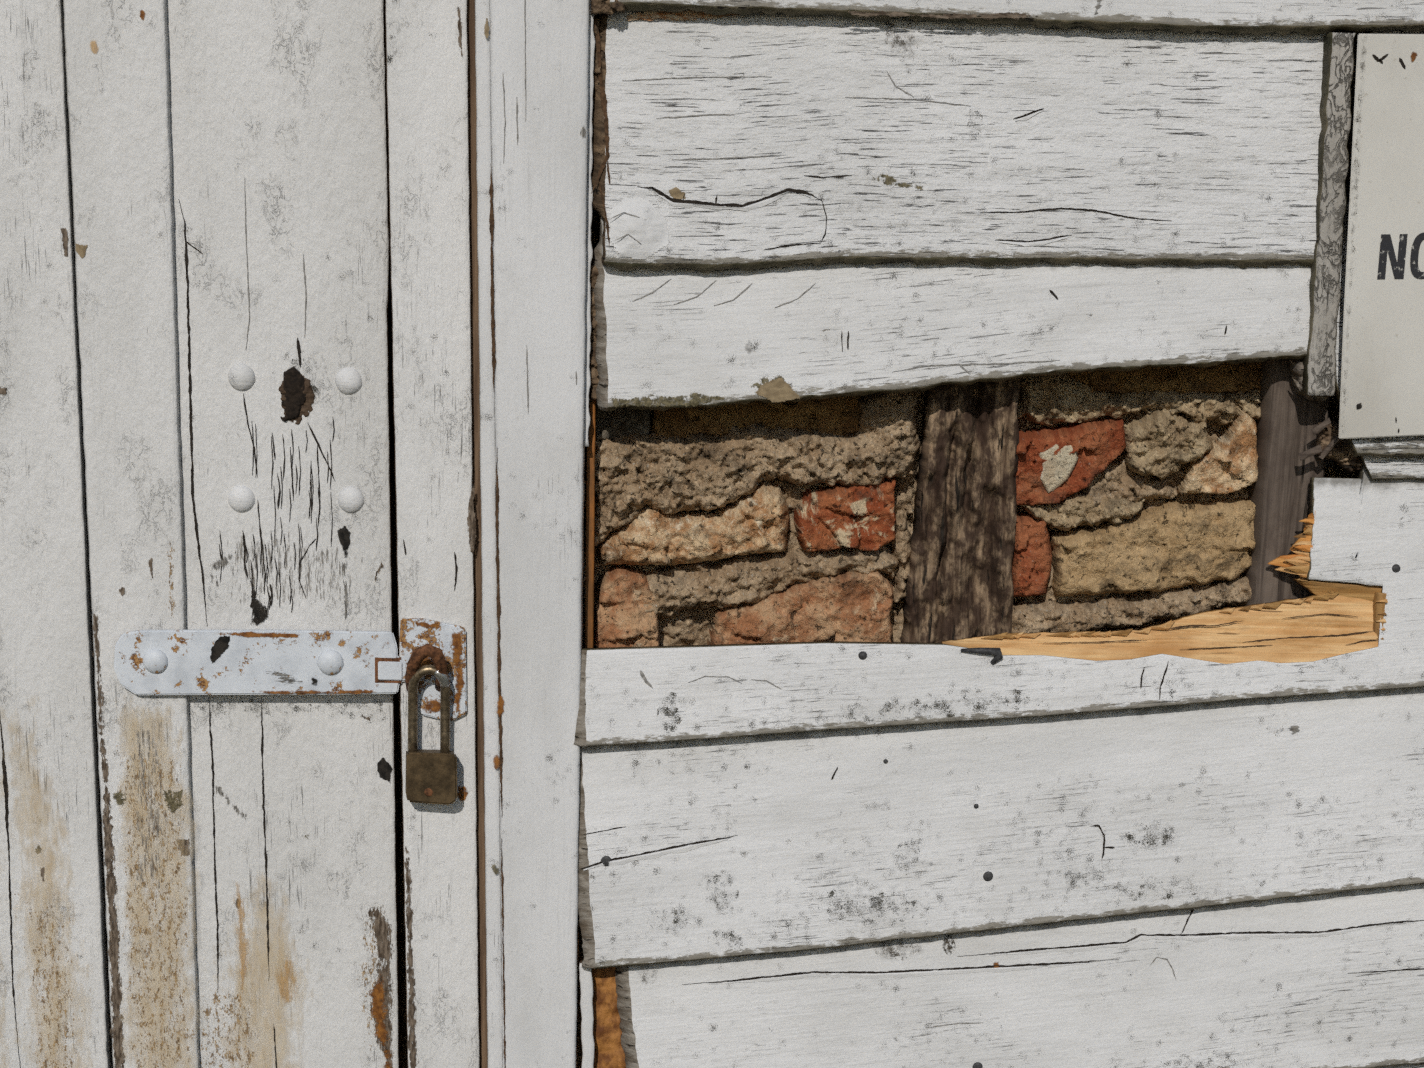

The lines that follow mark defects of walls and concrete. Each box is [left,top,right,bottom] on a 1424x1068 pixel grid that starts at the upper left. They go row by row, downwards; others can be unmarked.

crack [591,15,851,250]
crack [632,279,816,308]
peeling [612,393,725,408]
peeling [755,378,800,402]
spalling [1039,444,1078,494]
rust [415,622,465,713]
peeling [92,614,191,1068]
crack [579,827,738,870]
crack [682,909,1424,985]
rust [369,980,391,1068]